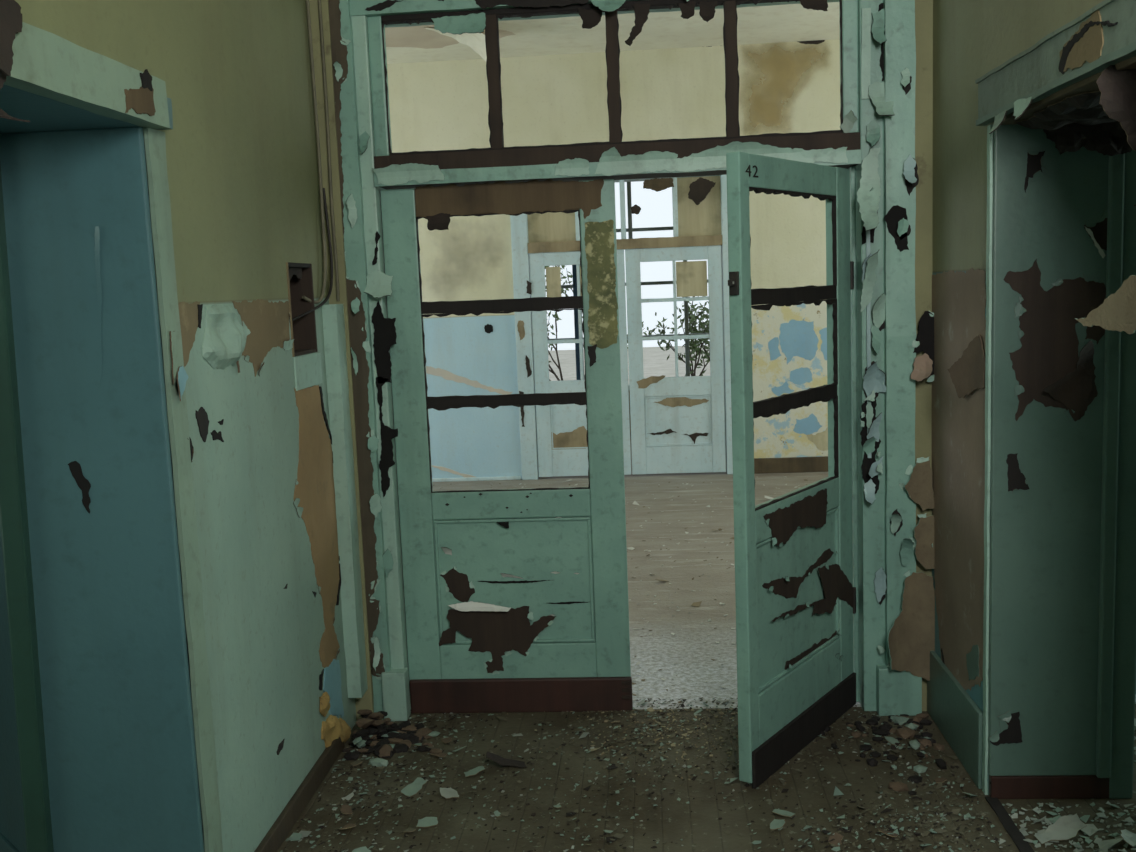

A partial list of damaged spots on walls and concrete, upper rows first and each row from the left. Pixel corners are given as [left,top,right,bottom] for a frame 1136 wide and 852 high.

peeling [0,0,22,90]
damp [747,44,825,128]
peeling [751,299,827,402]
peeling [1004,259,1106,421]
flaking render [293,385,344,717]
peeling [346,270,394,680]
peeling [439,547,556,675]
peeling [753,401,828,458]
peeling [764,479,828,548]
peeling [762,548,854,622]
flaking render [877,268,986,691]
peeling [280,618,1136,852]